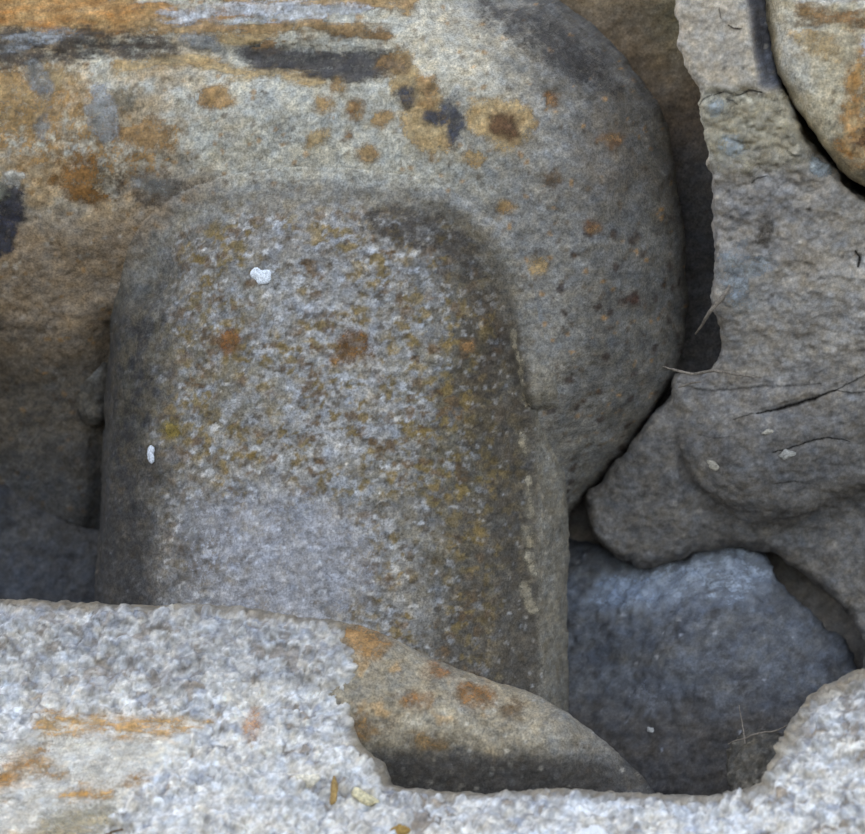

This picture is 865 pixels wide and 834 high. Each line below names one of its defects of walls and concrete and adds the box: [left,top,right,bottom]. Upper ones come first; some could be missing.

crack [696,375,865,419]